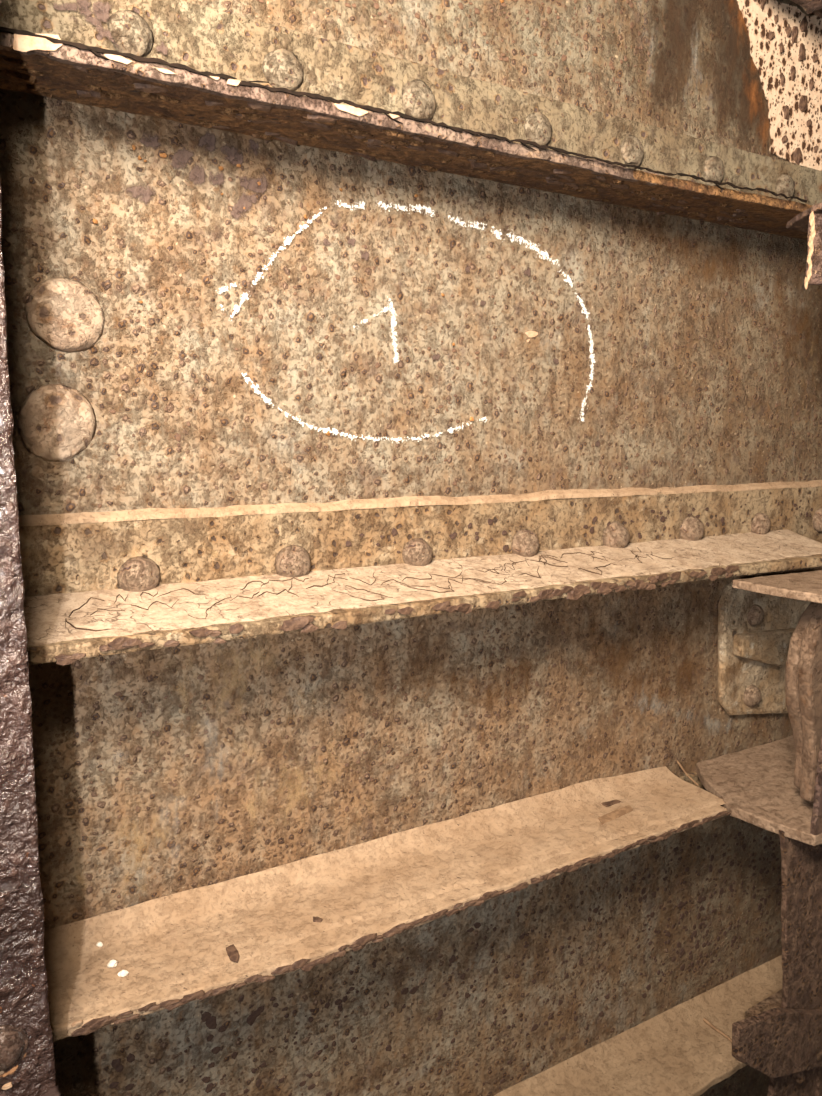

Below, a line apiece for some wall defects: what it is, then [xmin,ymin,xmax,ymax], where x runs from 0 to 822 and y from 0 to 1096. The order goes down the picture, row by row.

rust [54,0,119,47]
rust [753,0,818,86]
peeling [737,0,822,171]
rust [784,79,814,127]
rust [782,135,819,165]
rust [127,185,156,204]
rust [132,132,268,219]
rust [347,238,369,260]
crack [65,547,689,632]
rust [0,1054,26,1096]